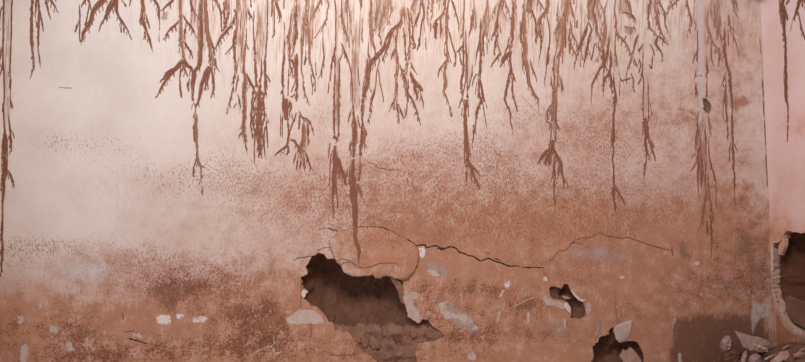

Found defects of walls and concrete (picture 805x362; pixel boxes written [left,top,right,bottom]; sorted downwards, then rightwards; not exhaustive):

water stain [779,0,805,142]
water stain [0,0,15,277]
water stain [74,0,739,265]
spalling [286,253,443,362]
peeling [418,247,450,276]
peeling [438,301,478,333]
crack [294,226,674,270]
spalling [543,277,592,333]
spalling [590,319,644,362]
water stain [671,315,769,362]
spalling [751,231,805,339]